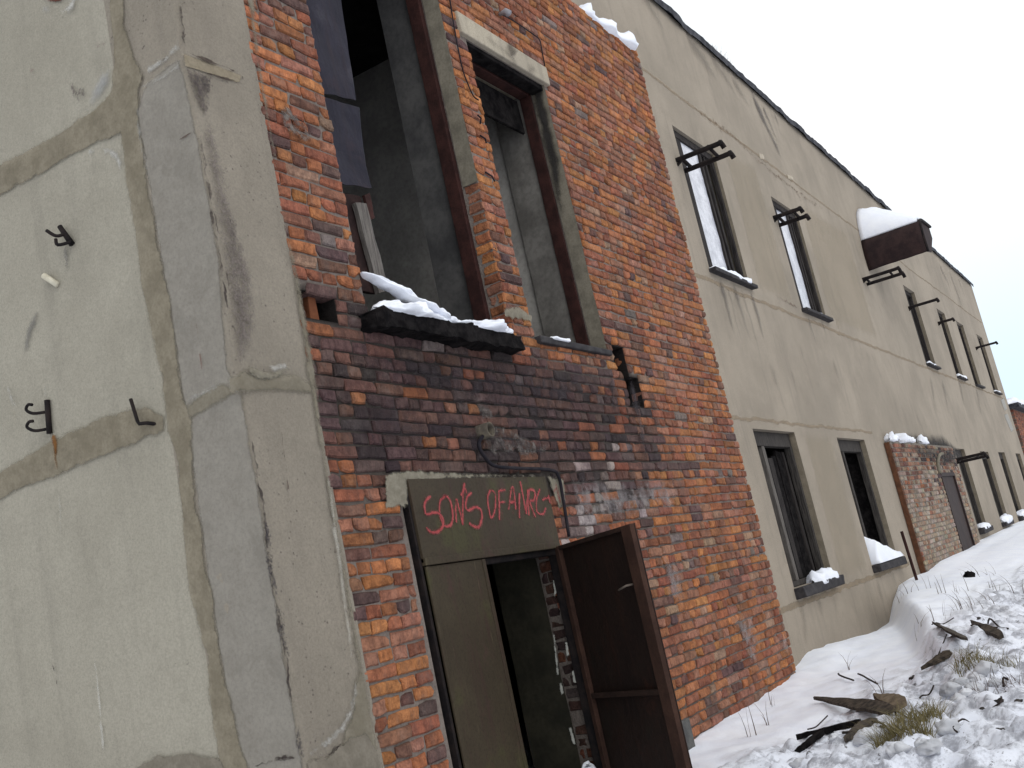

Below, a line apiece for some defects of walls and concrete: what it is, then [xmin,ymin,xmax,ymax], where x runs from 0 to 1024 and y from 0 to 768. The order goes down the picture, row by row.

crack [252,442,268,554]
crack [271,585,292,699]
crack [257,755,294,766]